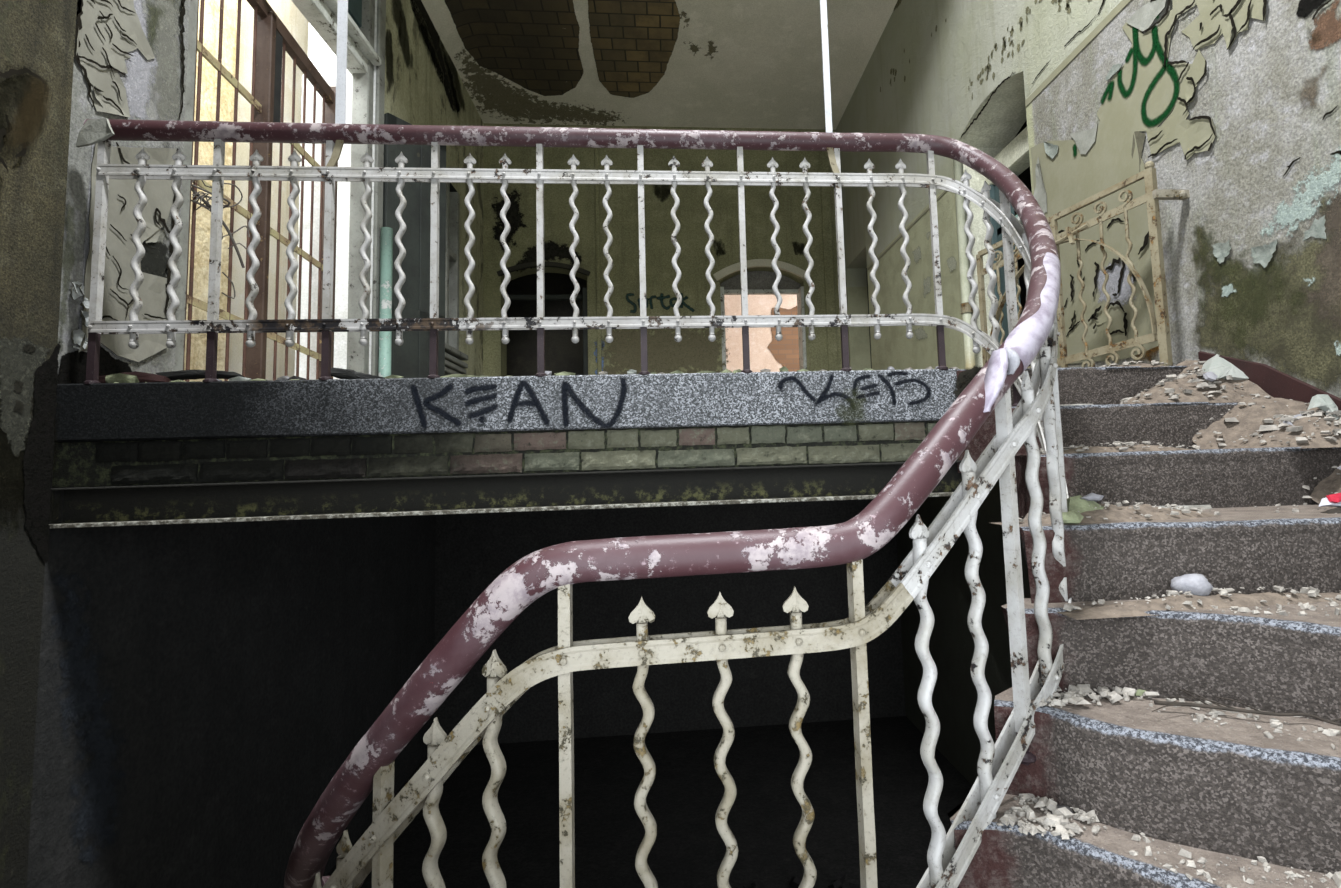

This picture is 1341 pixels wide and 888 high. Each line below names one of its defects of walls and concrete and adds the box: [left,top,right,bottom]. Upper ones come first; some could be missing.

flaking render [445,0,718,126]
peeling [968,0,1071,100]
flaking render [1296,0,1341,50]
peeling [1004,0,1267,375]
peeling [1251,147,1341,268]
peeling [0,0,176,563]
damp [0,399,29,527]